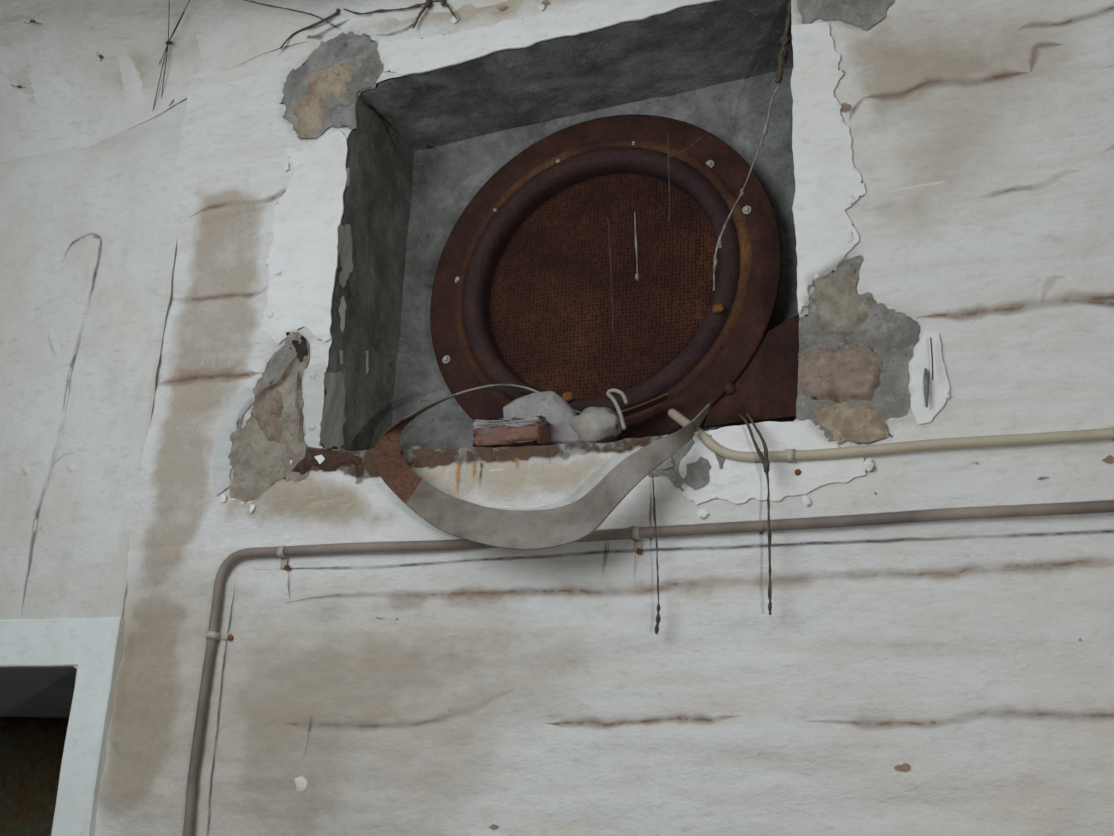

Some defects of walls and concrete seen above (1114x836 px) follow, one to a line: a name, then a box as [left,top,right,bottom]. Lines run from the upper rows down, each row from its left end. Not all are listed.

crack [992,20,1072,80]
peeling [212,0,713,513]
spalling [648,0,950,518]
crack [918,305,1022,318]
crack [1089,295,1114,306]
damp [158,192,253,518]
rust [305,447,380,483]
rust [400,435,662,490]
crack [583,547,682,555]
crack [710,538,930,549]
crack [1010,529,1114,537]
crack [208,596,234,824]